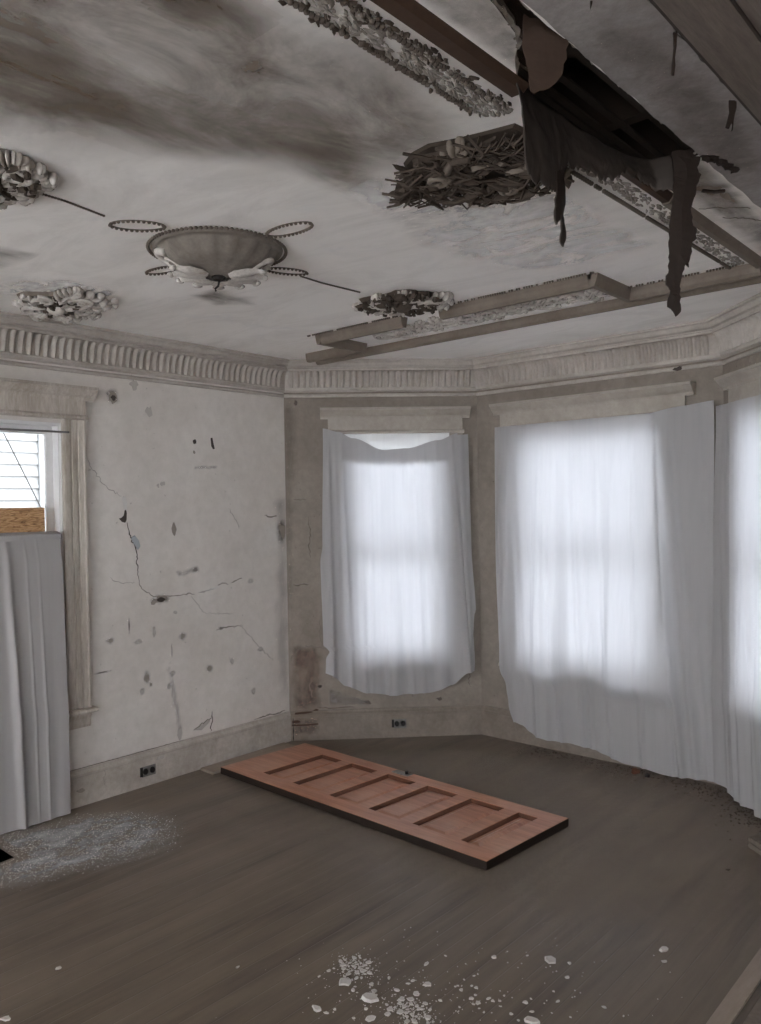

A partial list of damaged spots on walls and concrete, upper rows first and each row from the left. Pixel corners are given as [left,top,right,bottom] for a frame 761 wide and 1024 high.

damp [0,0,427,181]
crack [87,459,323,661]